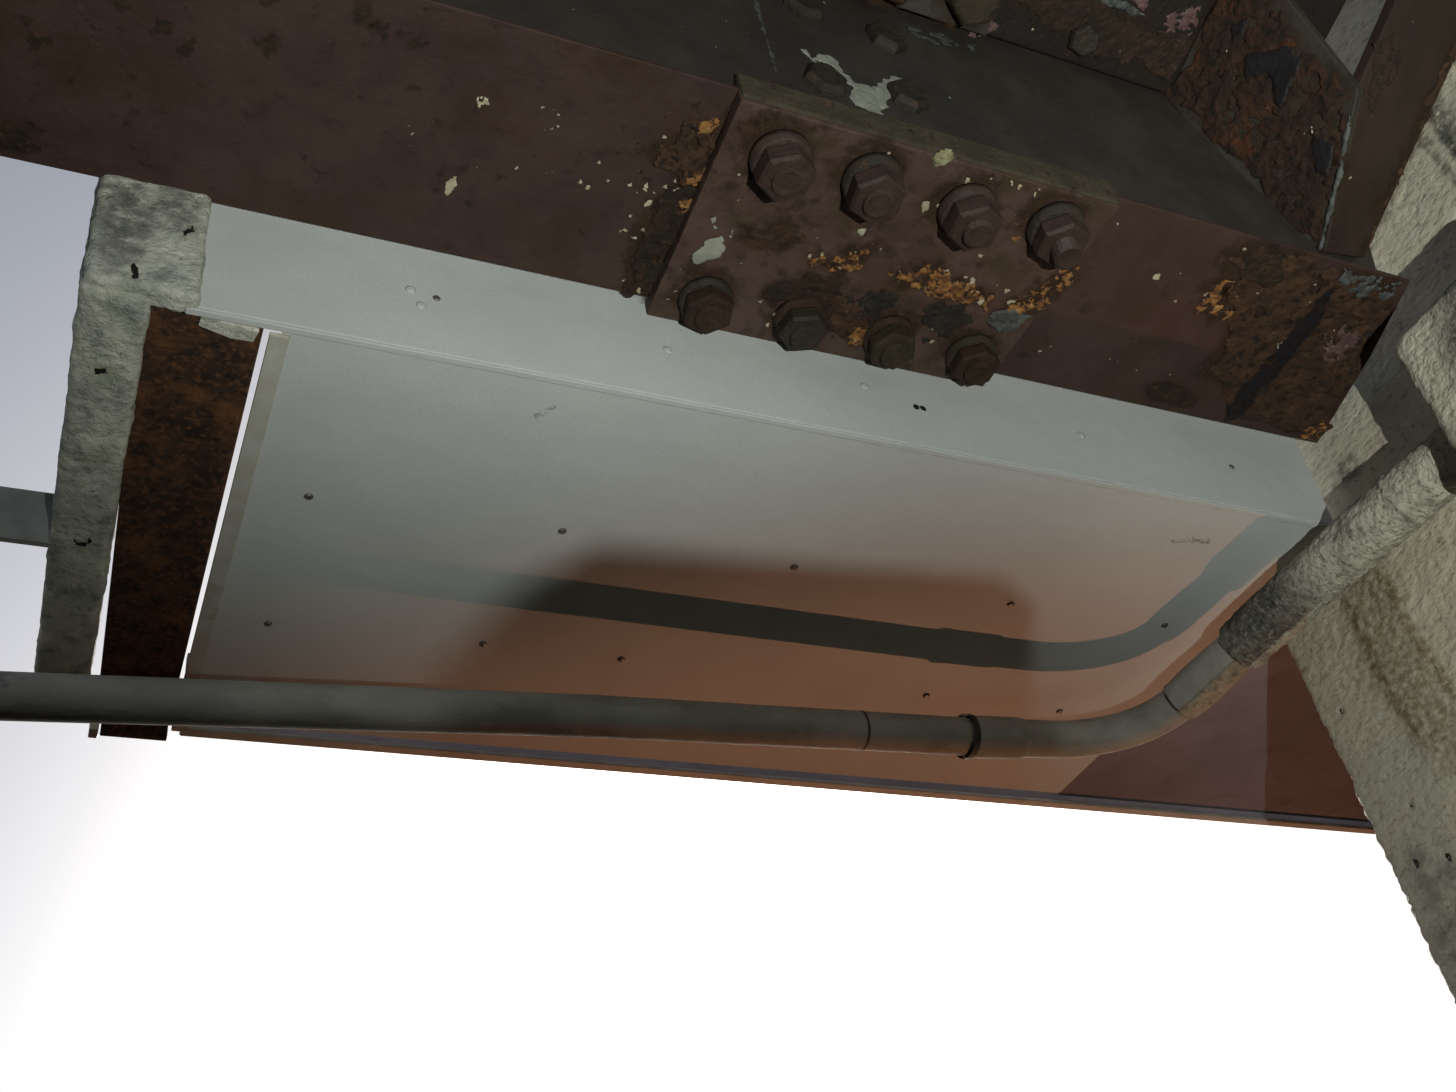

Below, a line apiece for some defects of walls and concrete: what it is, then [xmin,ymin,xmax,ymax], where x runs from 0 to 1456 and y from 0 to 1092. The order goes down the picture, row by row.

peeling [800,49,904,115]
peeling [1161,6,1201,41]
rust [578,101,734,300]
rust [1161,0,1413,440]
rust [759,228,882,347]
rust [888,262,1080,315]